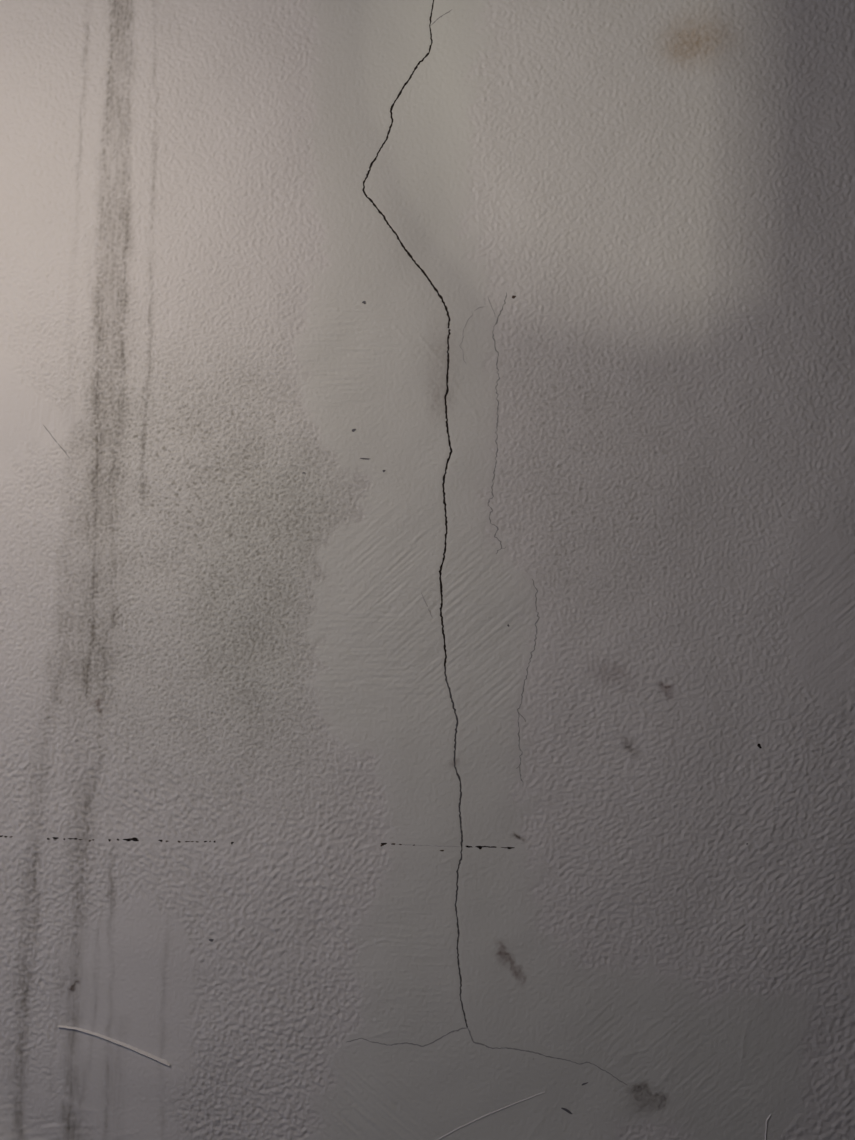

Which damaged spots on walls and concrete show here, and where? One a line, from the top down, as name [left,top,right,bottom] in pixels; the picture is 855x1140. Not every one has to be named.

crack [347,0,627,1085]